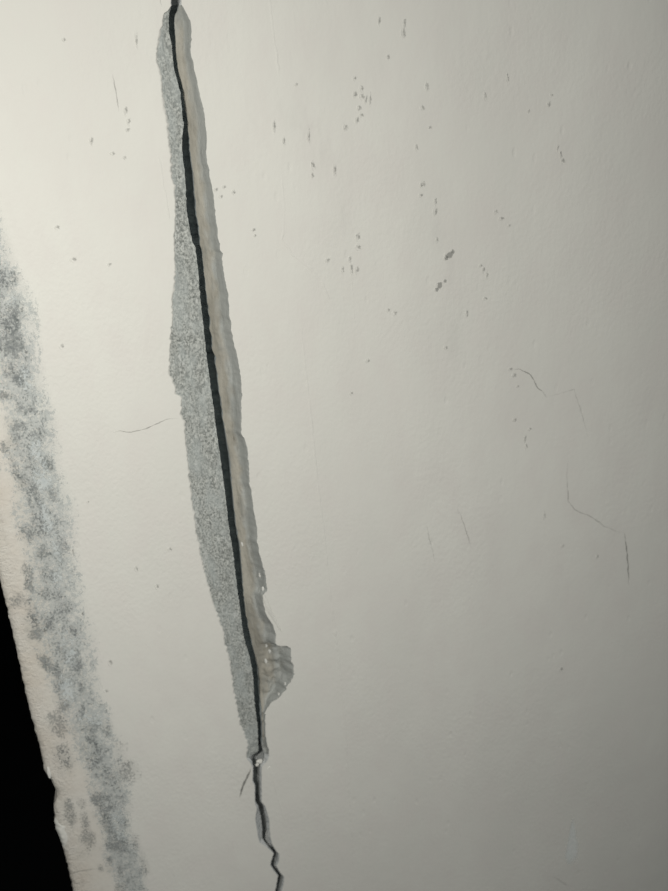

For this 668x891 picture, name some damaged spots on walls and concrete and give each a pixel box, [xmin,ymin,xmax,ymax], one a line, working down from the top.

flaking render [155,6,259,760]
crack [169,0,294,891]